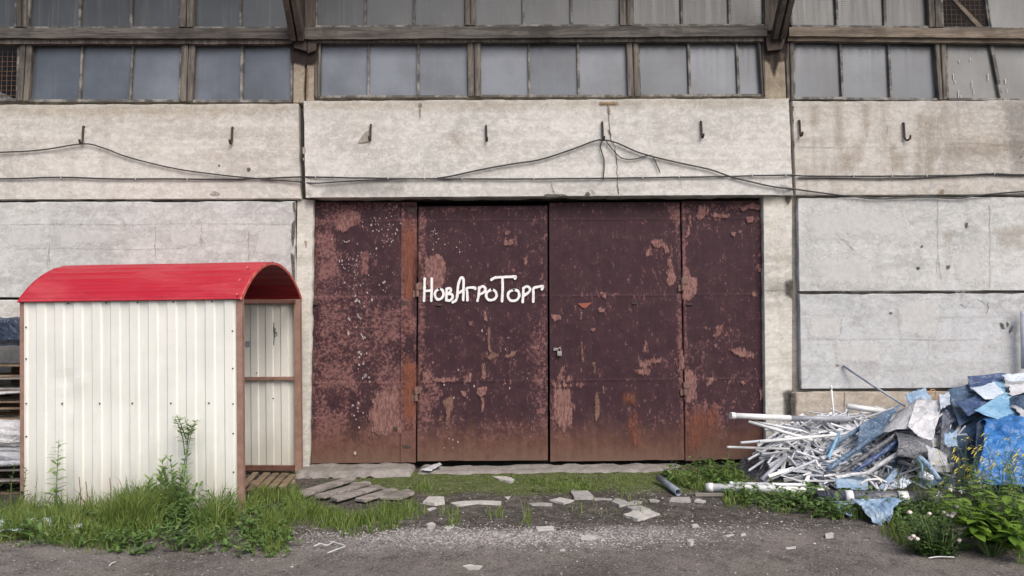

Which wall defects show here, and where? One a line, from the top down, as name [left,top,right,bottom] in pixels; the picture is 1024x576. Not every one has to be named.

peeling [336,210,361,233]
peeling [685,204,761,238]
peeling [646,238,697,301]
peeling [705,324,757,359]
peeling [366,385,405,440]
peeling [422,311,517,429]
peeling [550,341,596,433]
peeling [594,386,605,421]